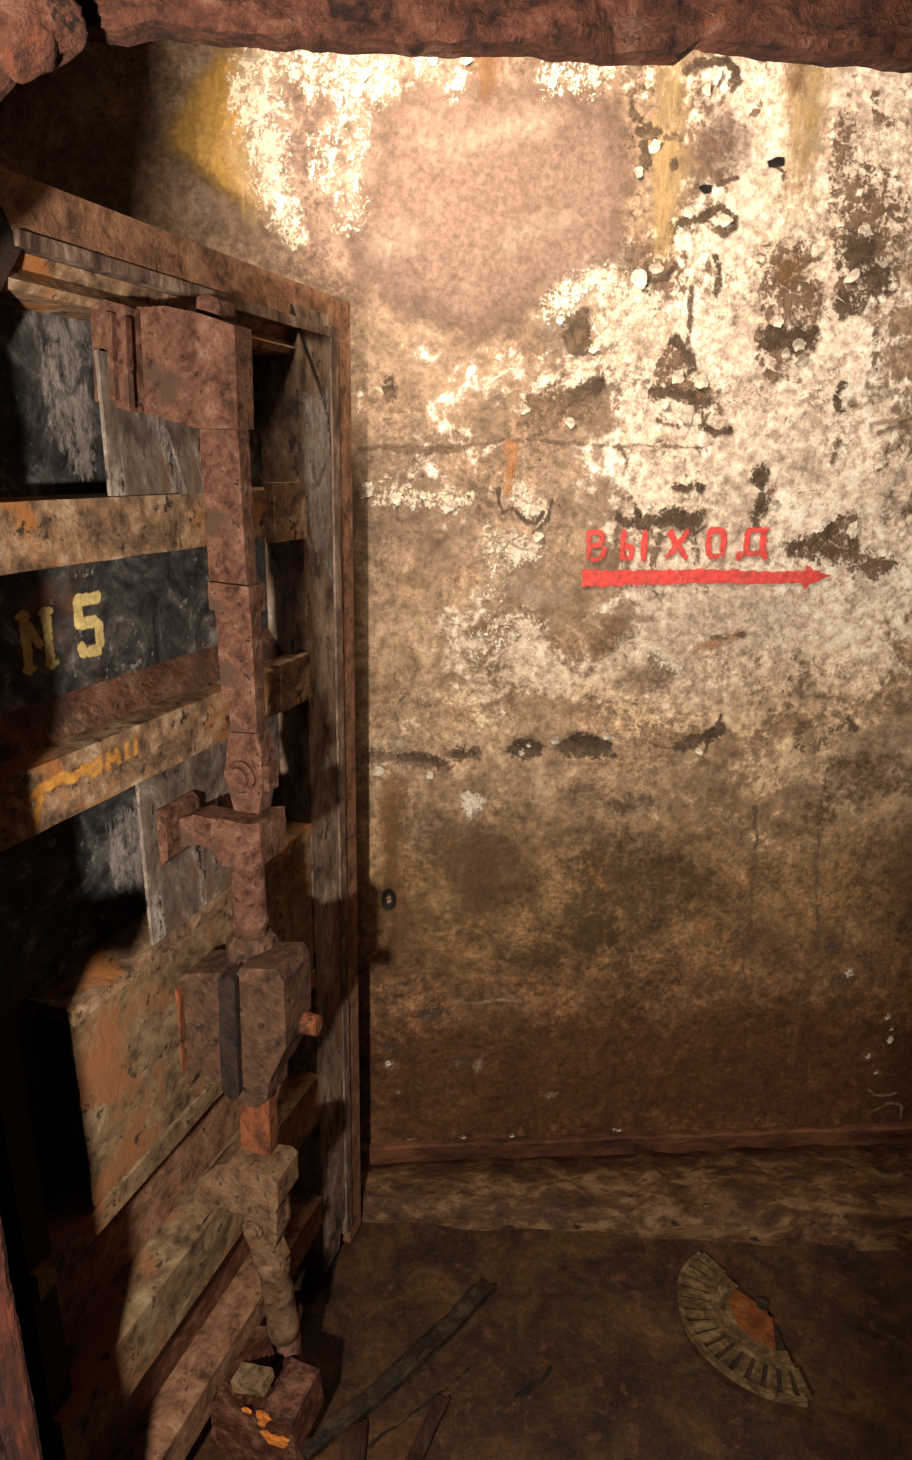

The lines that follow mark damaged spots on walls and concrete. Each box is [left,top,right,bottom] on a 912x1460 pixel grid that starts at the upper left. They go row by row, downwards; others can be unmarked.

water stain [168,47,309,251]
water stain [655,60,682,258]
water stain [787,64,827,195]
water stain [454,522,543,675]
water stain [641,639,683,678]
water stain [804,756,912,823]
water stain [507,794,716,969]